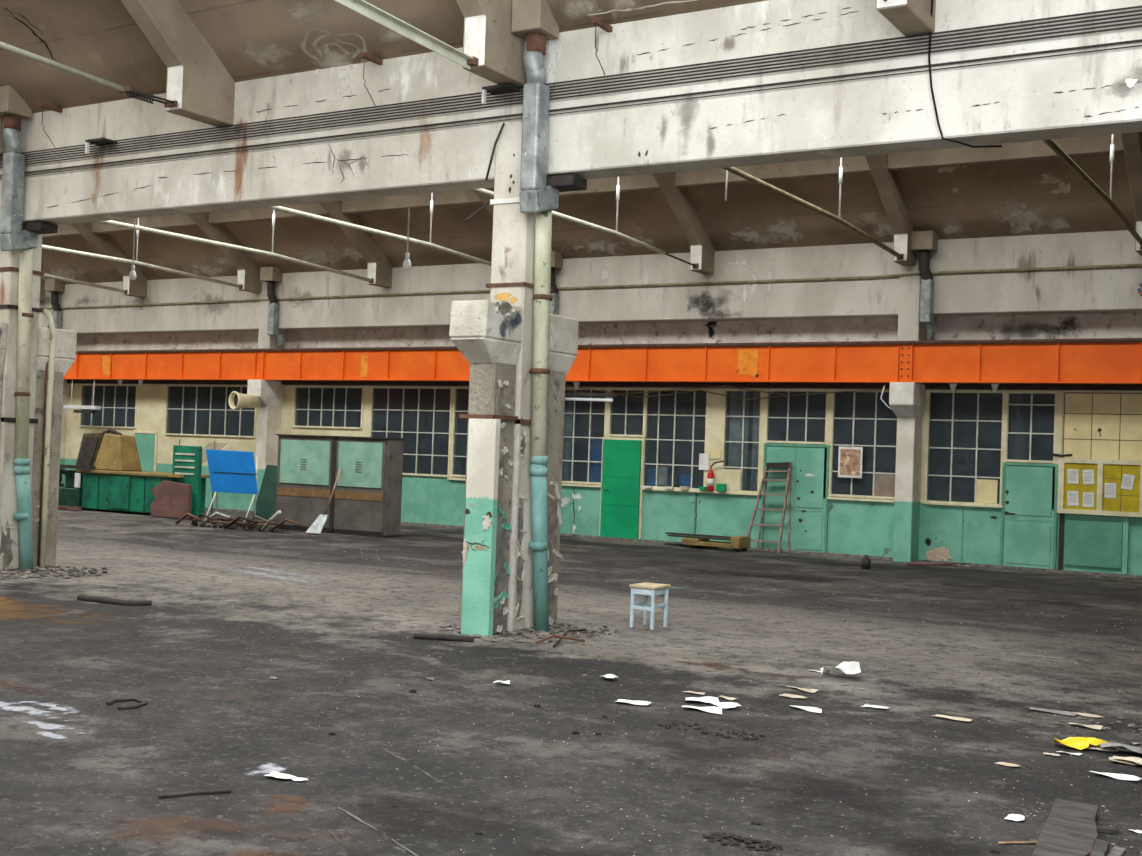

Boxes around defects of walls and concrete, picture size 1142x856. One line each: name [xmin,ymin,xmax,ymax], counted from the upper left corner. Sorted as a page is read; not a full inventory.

corrosion [235,121,246,193]
spalling [0,520,17,570]
spalling [482,496,527,633]